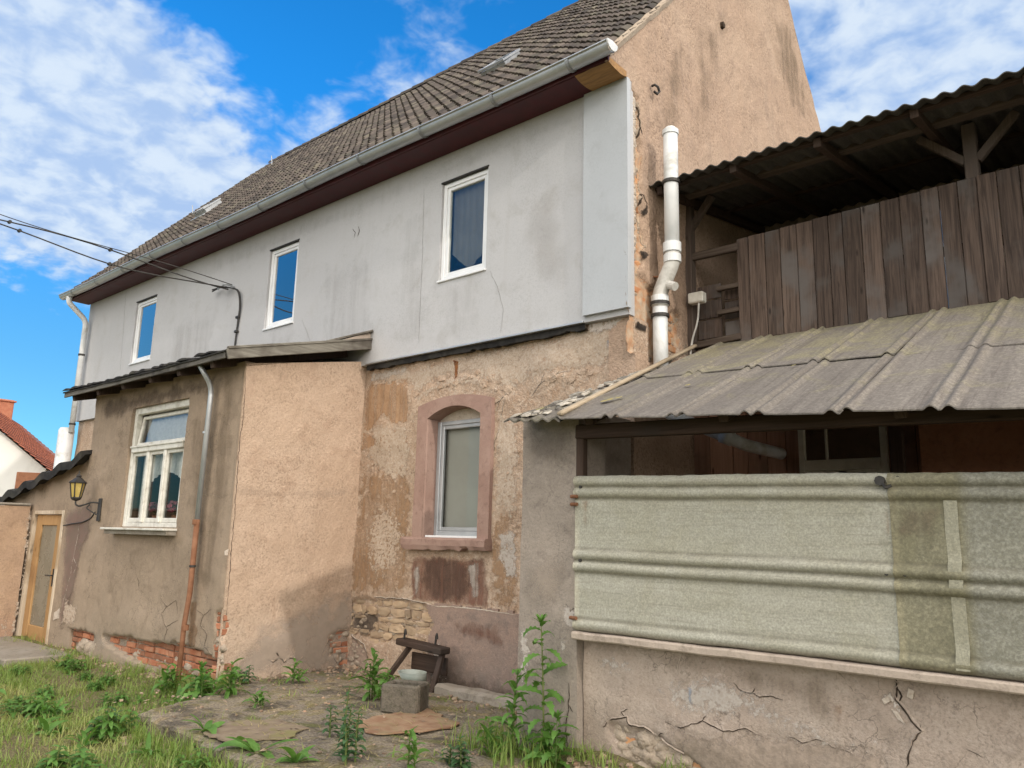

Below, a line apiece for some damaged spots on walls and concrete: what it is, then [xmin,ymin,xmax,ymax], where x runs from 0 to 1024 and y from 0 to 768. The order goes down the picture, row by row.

flaking render [351,96,654,606]
spalling [668,311,688,359]
crack [161,380,246,654]
damp [412,558,488,606]
flaking render [109,612,234,681]
crack [734,681,783,700]
flaking render [613,725,701,768]
crack [602,709,763,754]
crack [789,735,854,755]
crack [893,679,924,767]